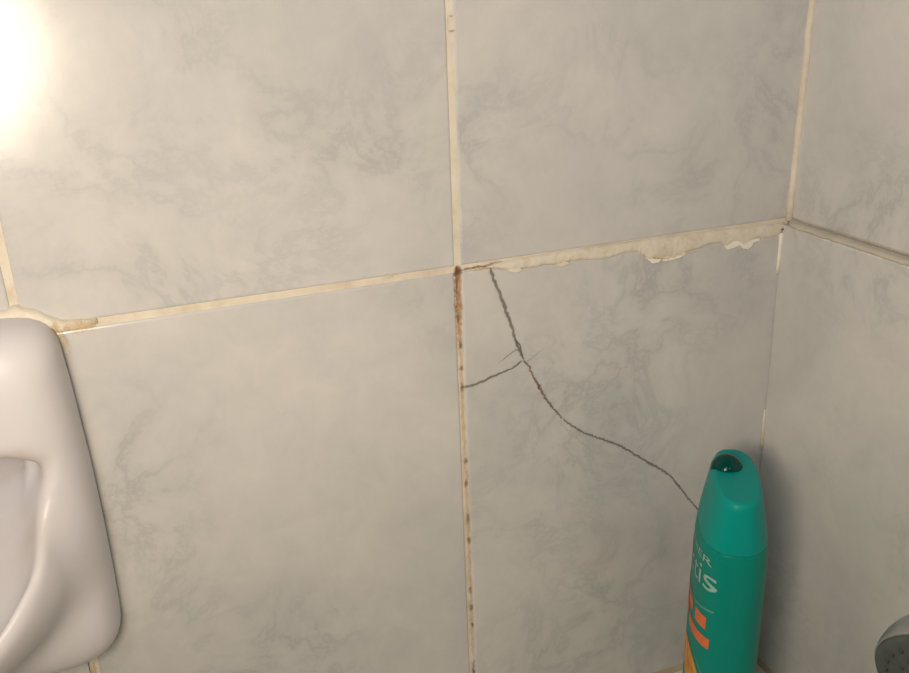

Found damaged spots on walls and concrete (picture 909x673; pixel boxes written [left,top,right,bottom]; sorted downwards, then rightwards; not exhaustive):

crack [464,268,698,510]